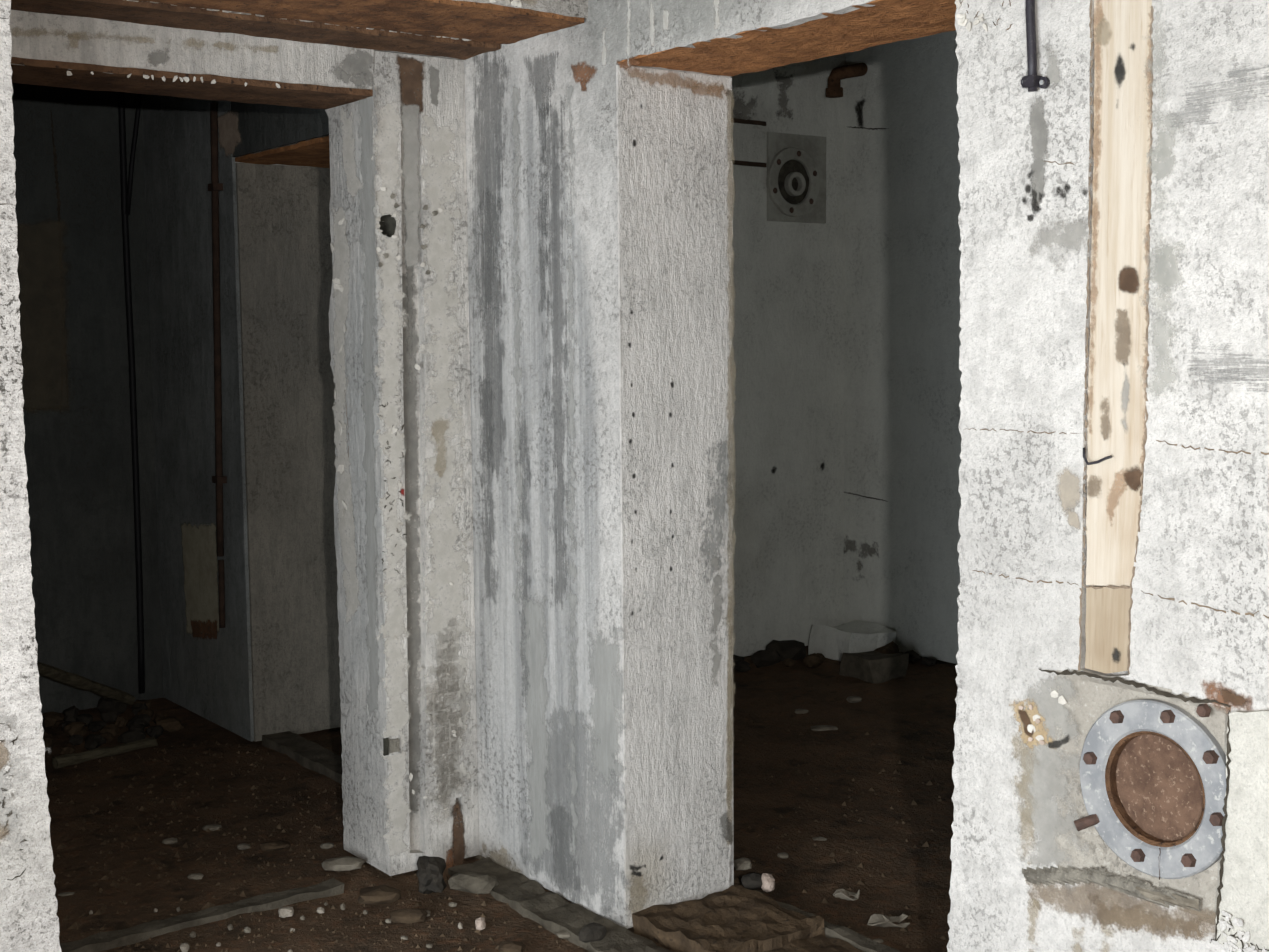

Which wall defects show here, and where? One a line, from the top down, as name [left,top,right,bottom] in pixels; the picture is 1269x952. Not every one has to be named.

damp [650,4,669,45]
damp [473,52,628,911]
rust [446,802,466,868]
rust [1105,731,1205,847]